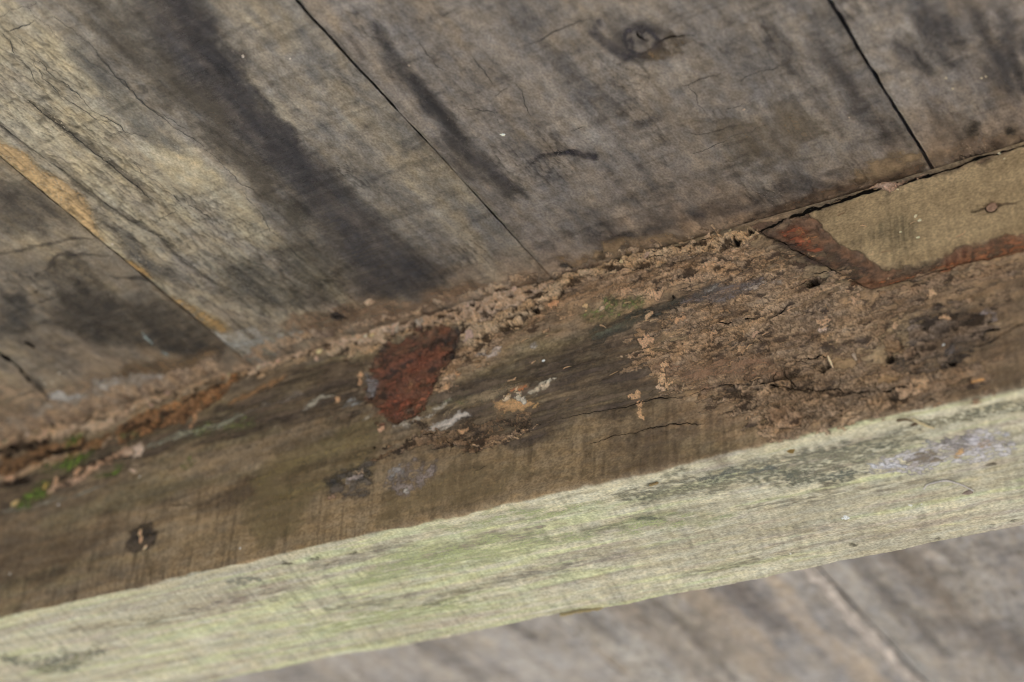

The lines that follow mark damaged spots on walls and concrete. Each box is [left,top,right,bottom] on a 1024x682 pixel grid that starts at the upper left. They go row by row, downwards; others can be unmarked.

leakage [374,26,528,198]
leakage [0,0,502,435]
crack [550,355,925,444]